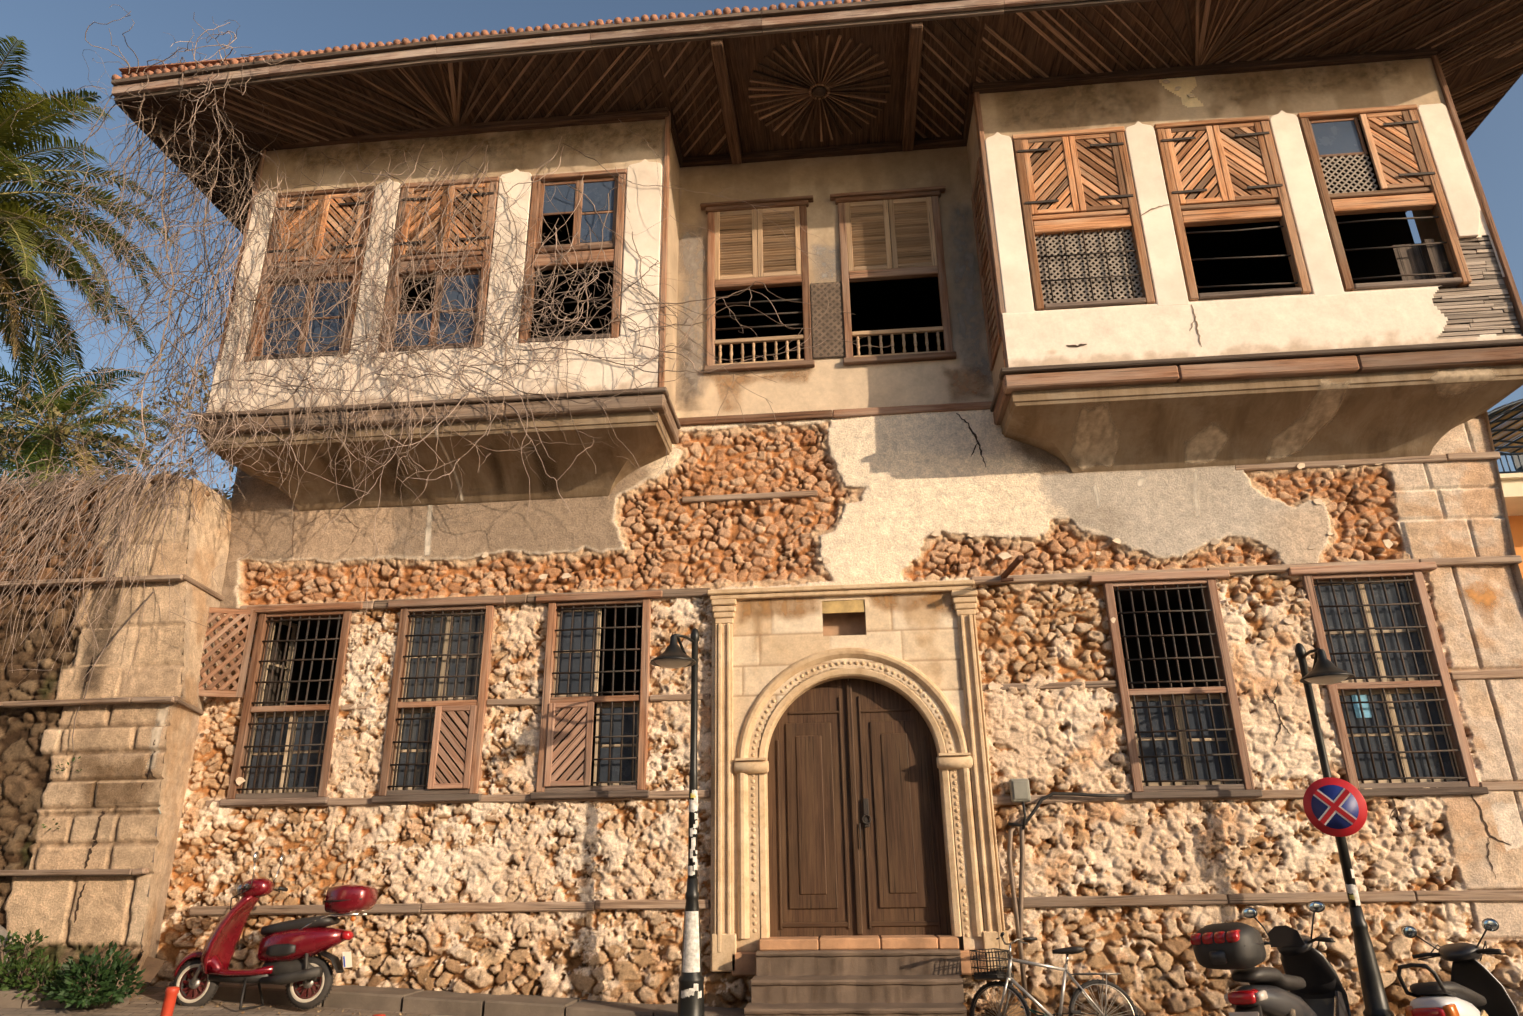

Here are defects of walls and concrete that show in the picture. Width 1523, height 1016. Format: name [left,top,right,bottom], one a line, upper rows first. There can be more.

spalling [1392,235,1523,339]
peeling [1071,405,1118,469]
peeling [1186,425,1228,463]
spalling [1244,381,1410,563]
spalling [237,421,860,697]
spalling [901,518,1339,783]
crack [74,811,105,923]
crack [1471,795,1510,878]